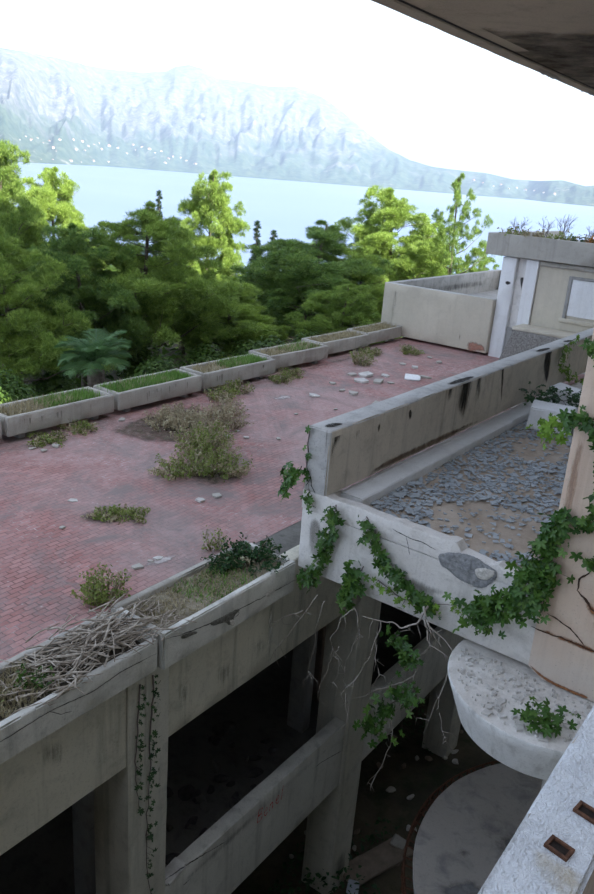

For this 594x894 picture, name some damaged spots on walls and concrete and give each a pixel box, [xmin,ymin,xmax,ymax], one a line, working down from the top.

water stain [488,31,594,89]
water stain [536,348,552,381]
spalling [438,552,497,588]
crack [577,573,594,612]
crack [531,614,594,652]